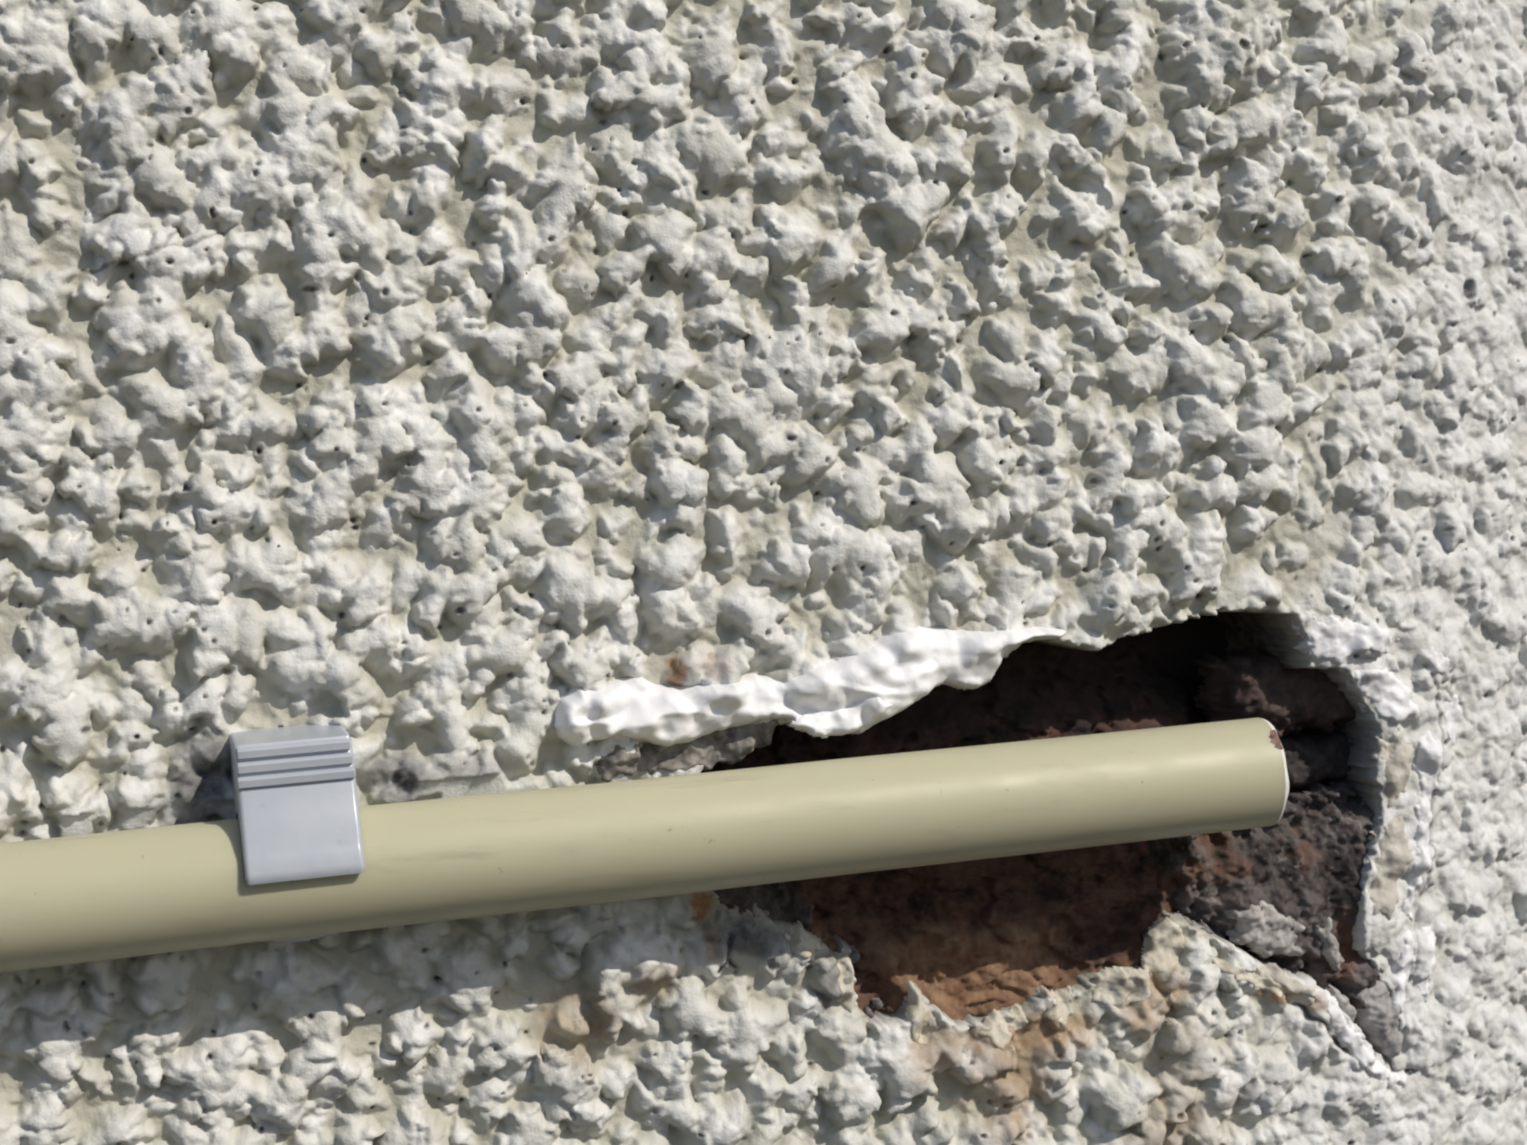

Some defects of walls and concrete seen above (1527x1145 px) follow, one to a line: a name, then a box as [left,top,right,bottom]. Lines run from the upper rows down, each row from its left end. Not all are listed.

spalling [595,615,1462,1087]